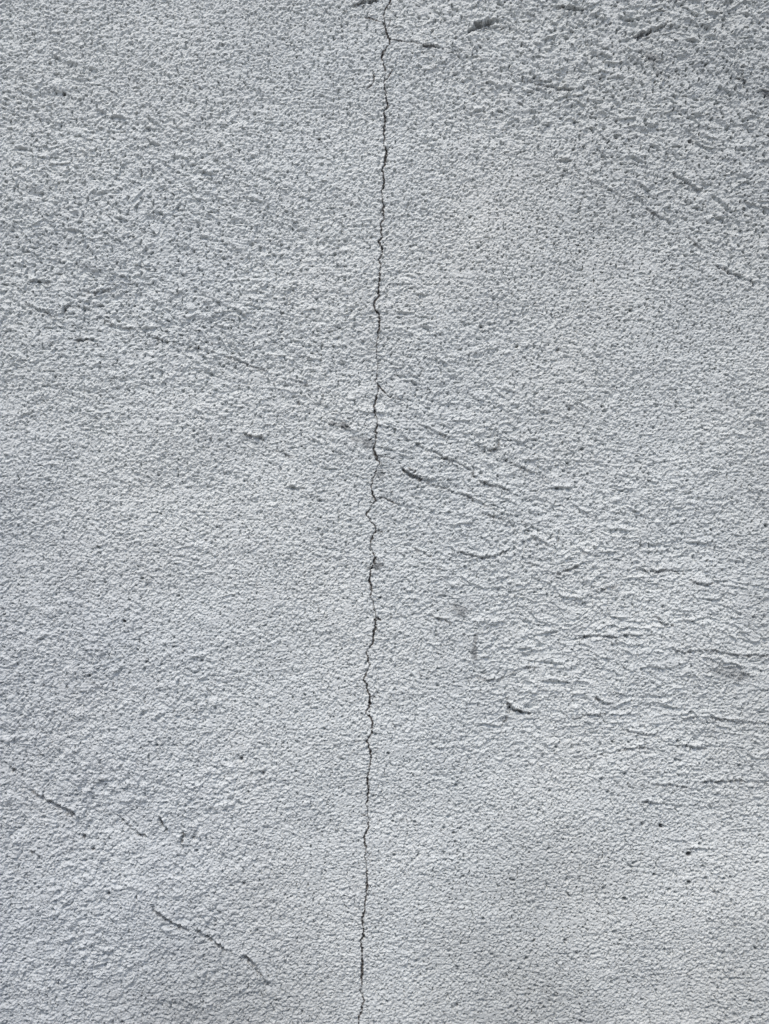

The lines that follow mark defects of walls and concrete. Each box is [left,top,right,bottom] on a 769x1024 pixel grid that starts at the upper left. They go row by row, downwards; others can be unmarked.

crack [355,0,418,1024]